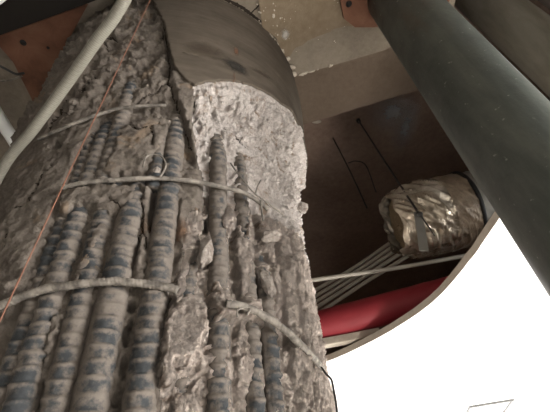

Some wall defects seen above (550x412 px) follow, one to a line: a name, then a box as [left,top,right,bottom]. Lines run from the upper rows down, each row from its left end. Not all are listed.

peeling [259,0,353,77]
crack [138,200,151,248]
spalling [0,0,336,412]